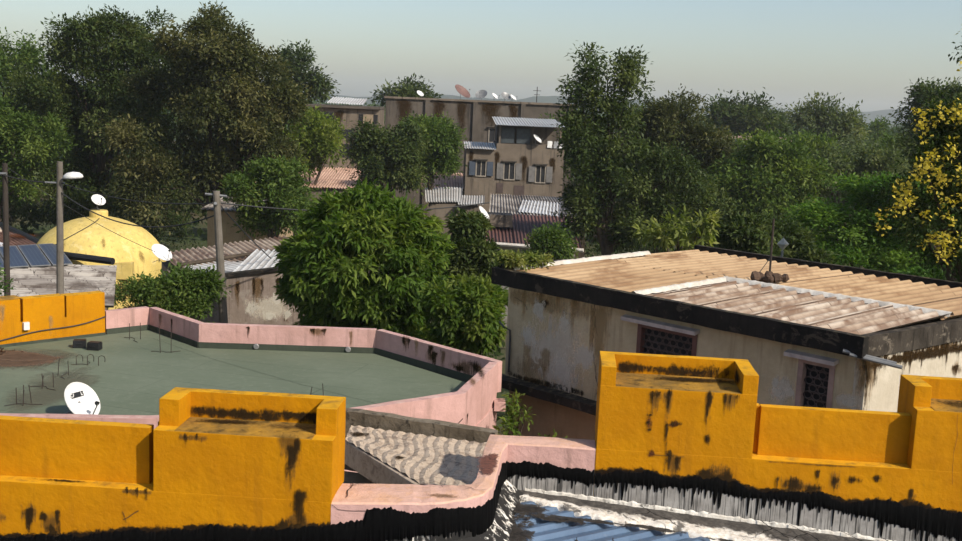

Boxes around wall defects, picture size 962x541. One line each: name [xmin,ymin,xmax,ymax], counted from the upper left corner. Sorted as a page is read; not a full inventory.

water stain [428,345,485,384]
water stain [617,361,740,476]
water stain [190,407,316,474]
water stain [699,466,733,486]
water stain [769,461,880,492]
water stain [22,504,61,533]